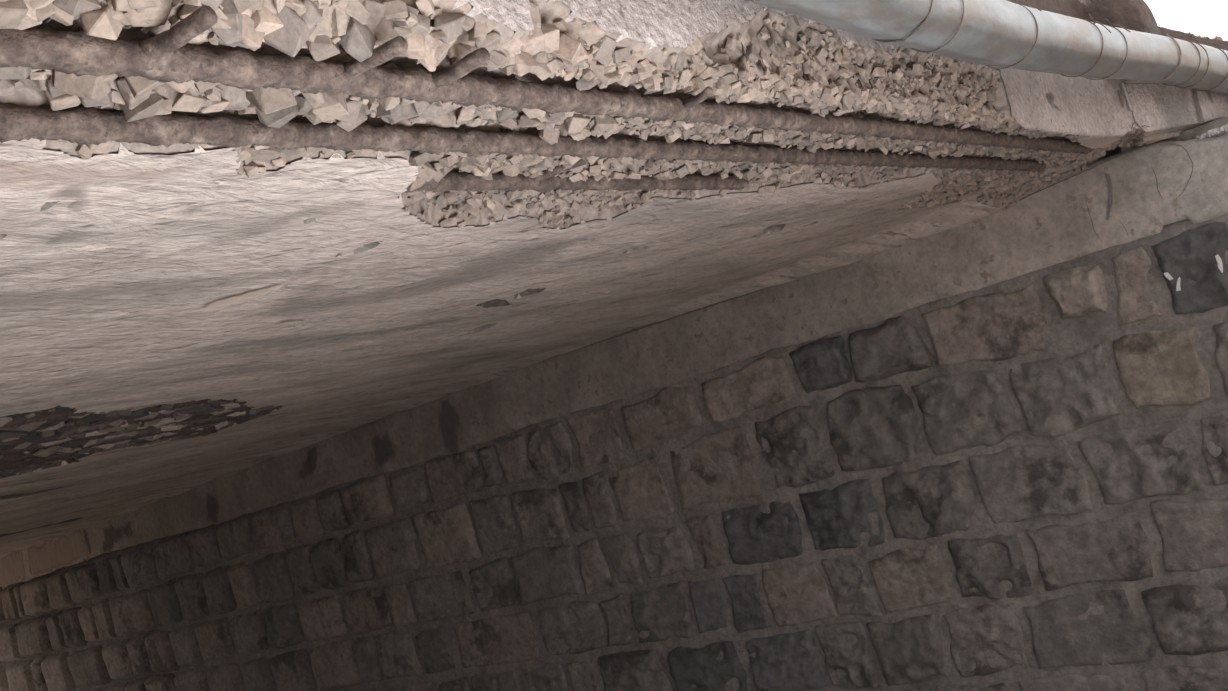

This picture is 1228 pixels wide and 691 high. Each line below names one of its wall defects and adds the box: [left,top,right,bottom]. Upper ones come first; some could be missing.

spalling [0,0,1147,229]
spalling [0,399,283,479]